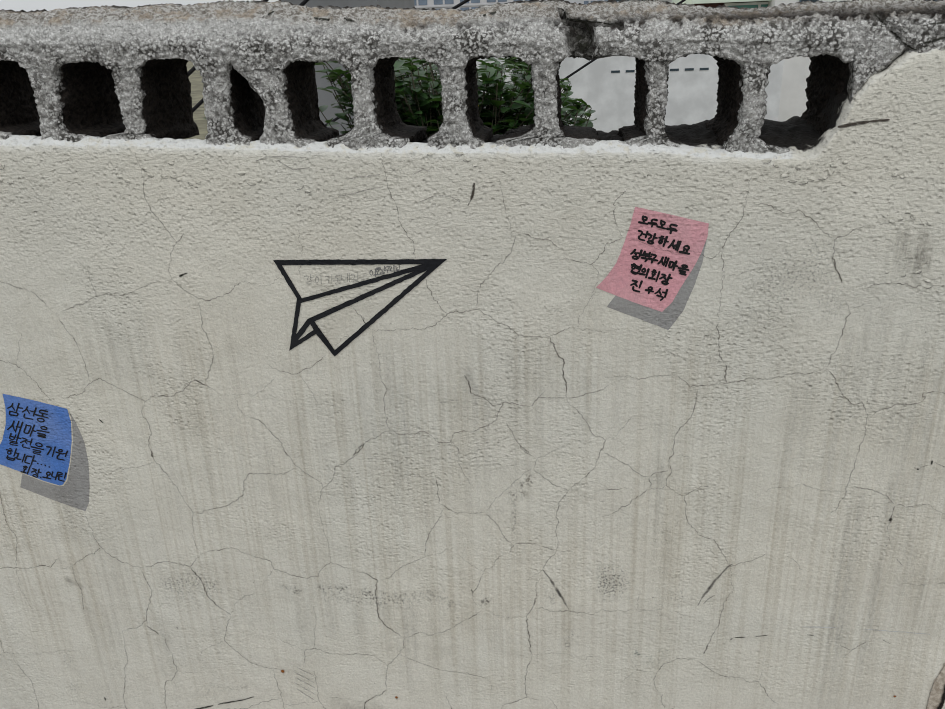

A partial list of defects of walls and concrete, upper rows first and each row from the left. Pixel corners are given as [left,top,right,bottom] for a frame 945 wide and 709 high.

crack [768,205,862,282]
crack [10,282,239,475]
crack [346,234,605,566]
crack [608,326,765,566]
crack [793,315,934,521]
crack [124,545,278,709]
crack [266,482,481,709]
crack [512,594,585,703]
flaking render [926,663,945,709]
crack [937,686,945,709]